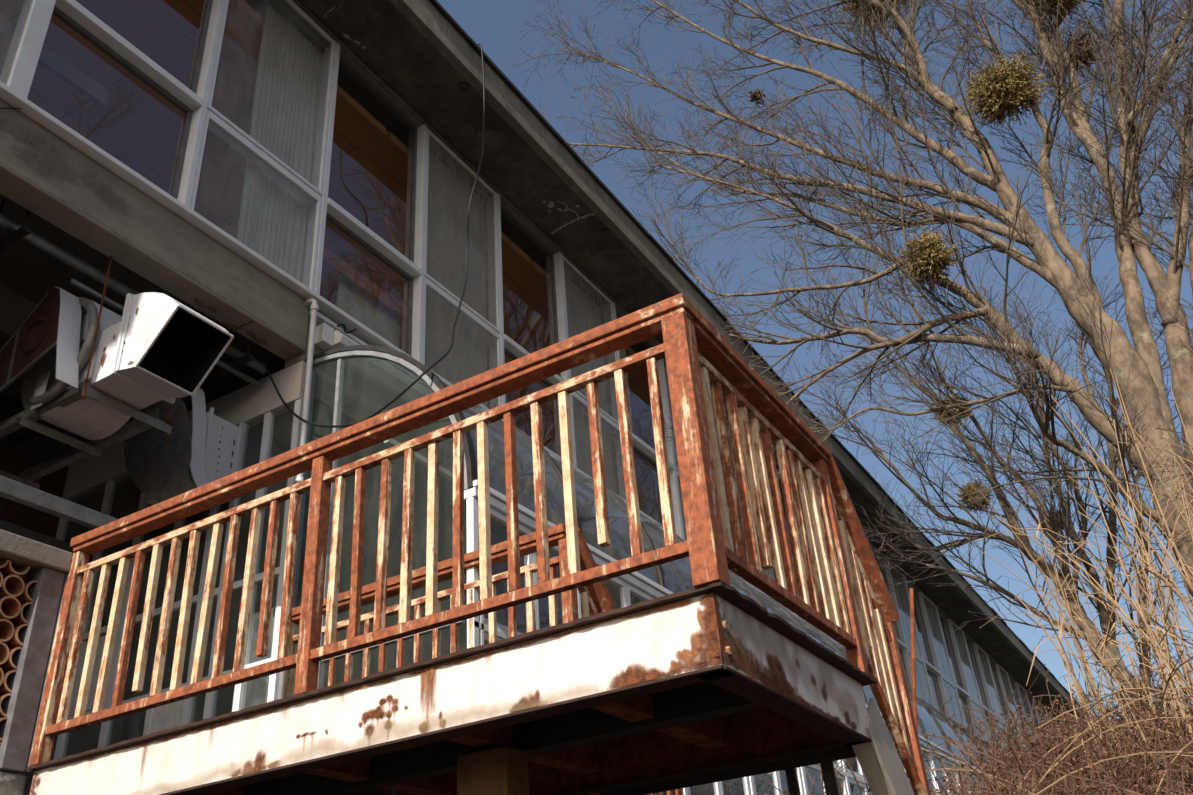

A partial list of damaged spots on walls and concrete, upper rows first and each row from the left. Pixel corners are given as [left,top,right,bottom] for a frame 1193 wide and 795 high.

corrosion [55,677,407,767]
corrosion [409,594,857,733]